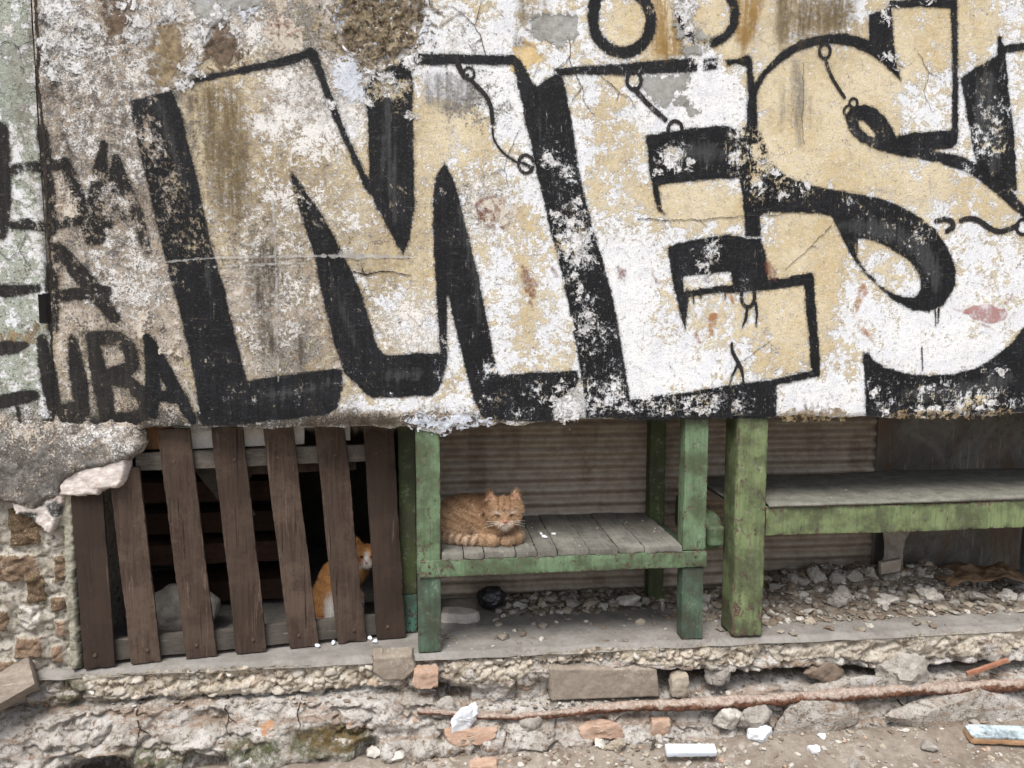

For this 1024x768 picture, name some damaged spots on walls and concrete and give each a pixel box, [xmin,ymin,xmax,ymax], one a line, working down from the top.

spalling [35,0,305,93]
spalling [318,0,444,117]
spalling [508,9,579,81]
peeling [641,0,714,118]